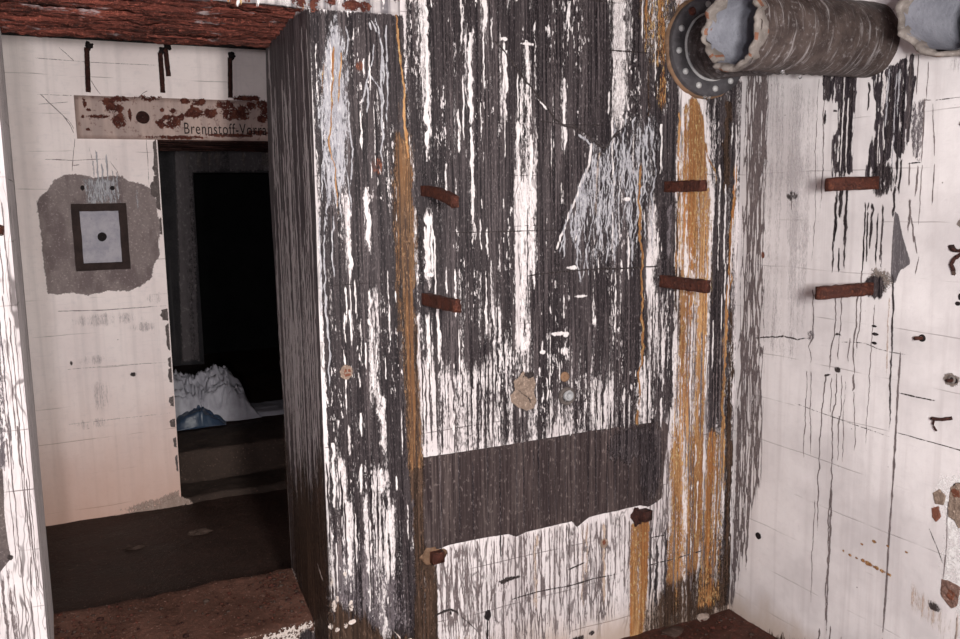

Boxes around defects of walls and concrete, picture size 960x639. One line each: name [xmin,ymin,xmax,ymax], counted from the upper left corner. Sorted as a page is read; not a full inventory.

rust [292,0,372,13]
rust [81,95,268,140]
leakage [0,203,41,639]
leakage [175,0,769,639]
rust [635,164,645,424]
rust [666,96,737,610]
leakage [803,53,935,639]
peeling [0,469,13,572]
rust [629,522,650,636]
spalling [929,483,960,632]
leakage [937,475,960,639]